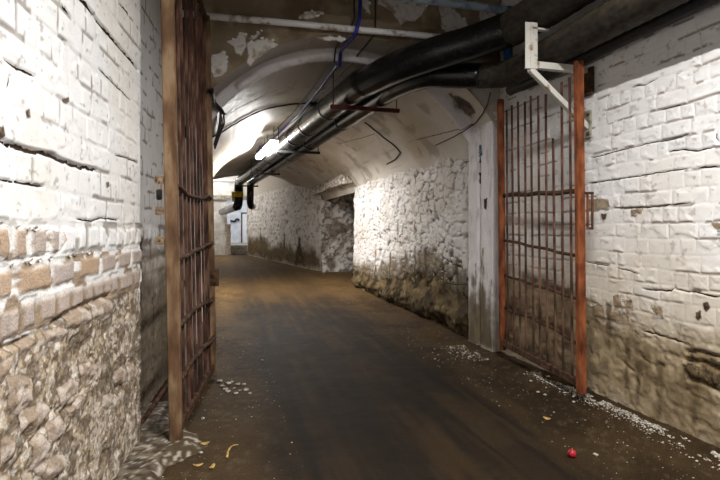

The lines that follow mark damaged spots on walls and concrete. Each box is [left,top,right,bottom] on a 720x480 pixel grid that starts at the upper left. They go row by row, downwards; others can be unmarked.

peeling [362,0,428,25]
peeling [438,6,468,32]
peeling [211,29,279,77]
crack [0,141,95,171]
water stain [248,228,319,267]
water stain [352,247,493,348]
water stain [506,277,576,376]
water stain [586,300,720,448]